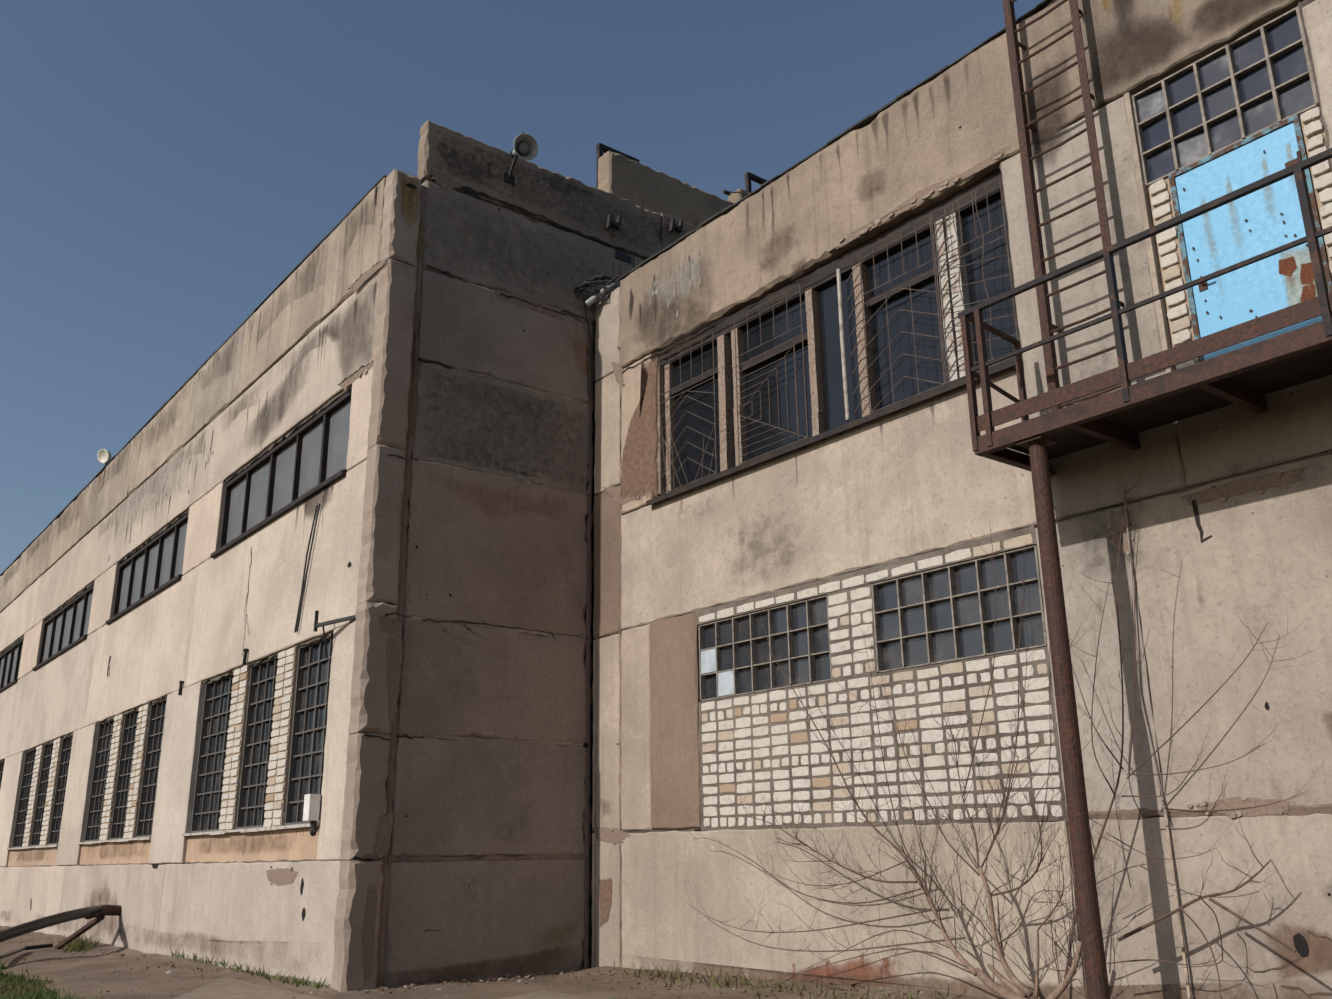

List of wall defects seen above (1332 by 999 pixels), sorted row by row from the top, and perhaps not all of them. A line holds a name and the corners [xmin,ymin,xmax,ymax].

leakage [1197,0,1276,31]
leakage [1098,22,1180,86]
leakage [247,388,286,435]
crack [1191,499,1212,542]
spalling [266,866,297,886]
spalling [1293,933,1309,957]